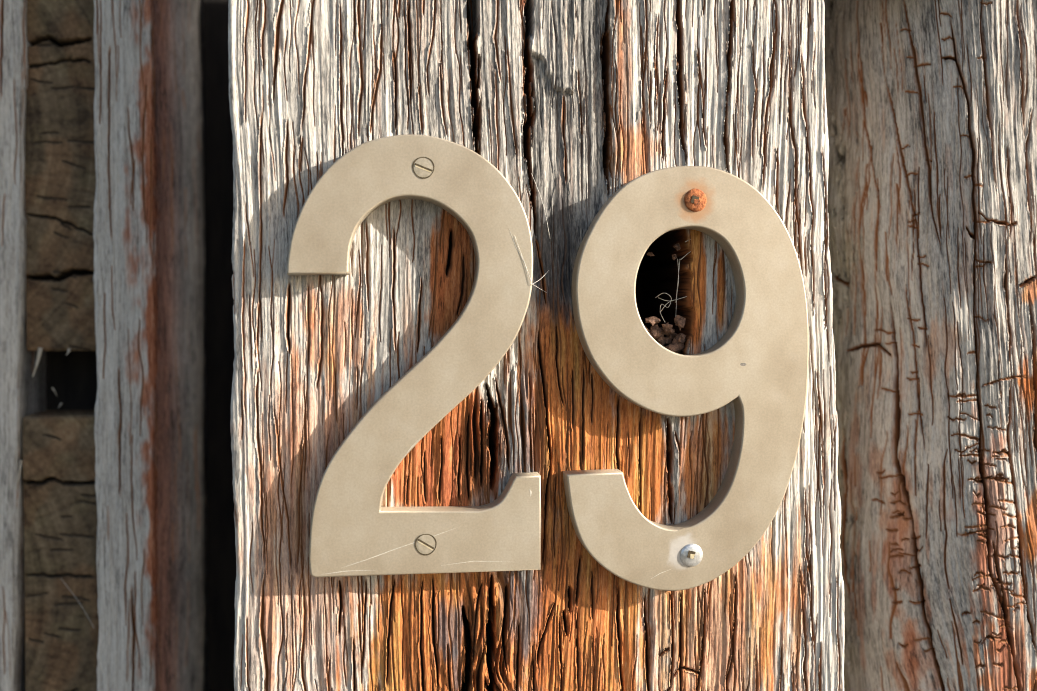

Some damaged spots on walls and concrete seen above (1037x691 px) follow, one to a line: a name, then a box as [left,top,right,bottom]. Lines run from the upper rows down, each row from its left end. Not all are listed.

crack [241,0,738,691]
corrosion [672,175,719,224]
crack [641,0,850,329]
crack [779,0,1037,691]